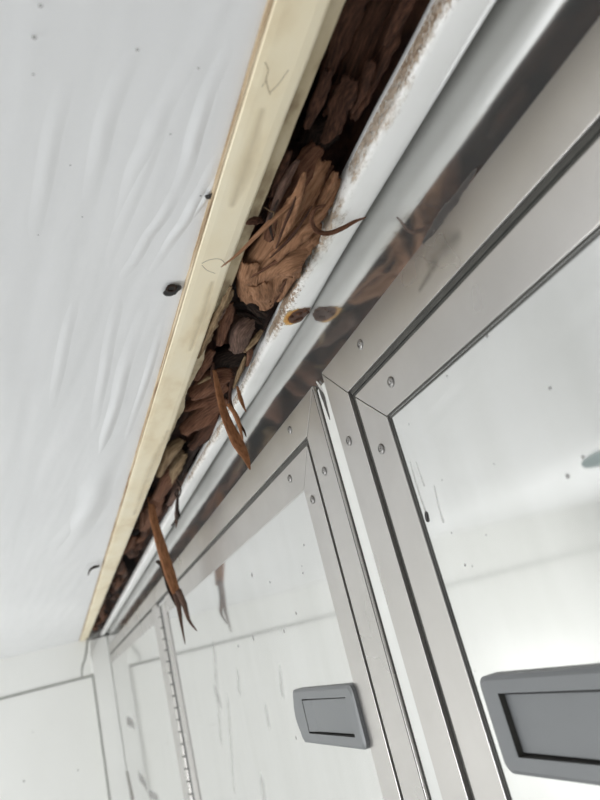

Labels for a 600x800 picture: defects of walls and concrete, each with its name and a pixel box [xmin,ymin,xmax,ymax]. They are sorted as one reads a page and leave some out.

peeling [138,139,341,532]
corrosion [269,206,341,335]